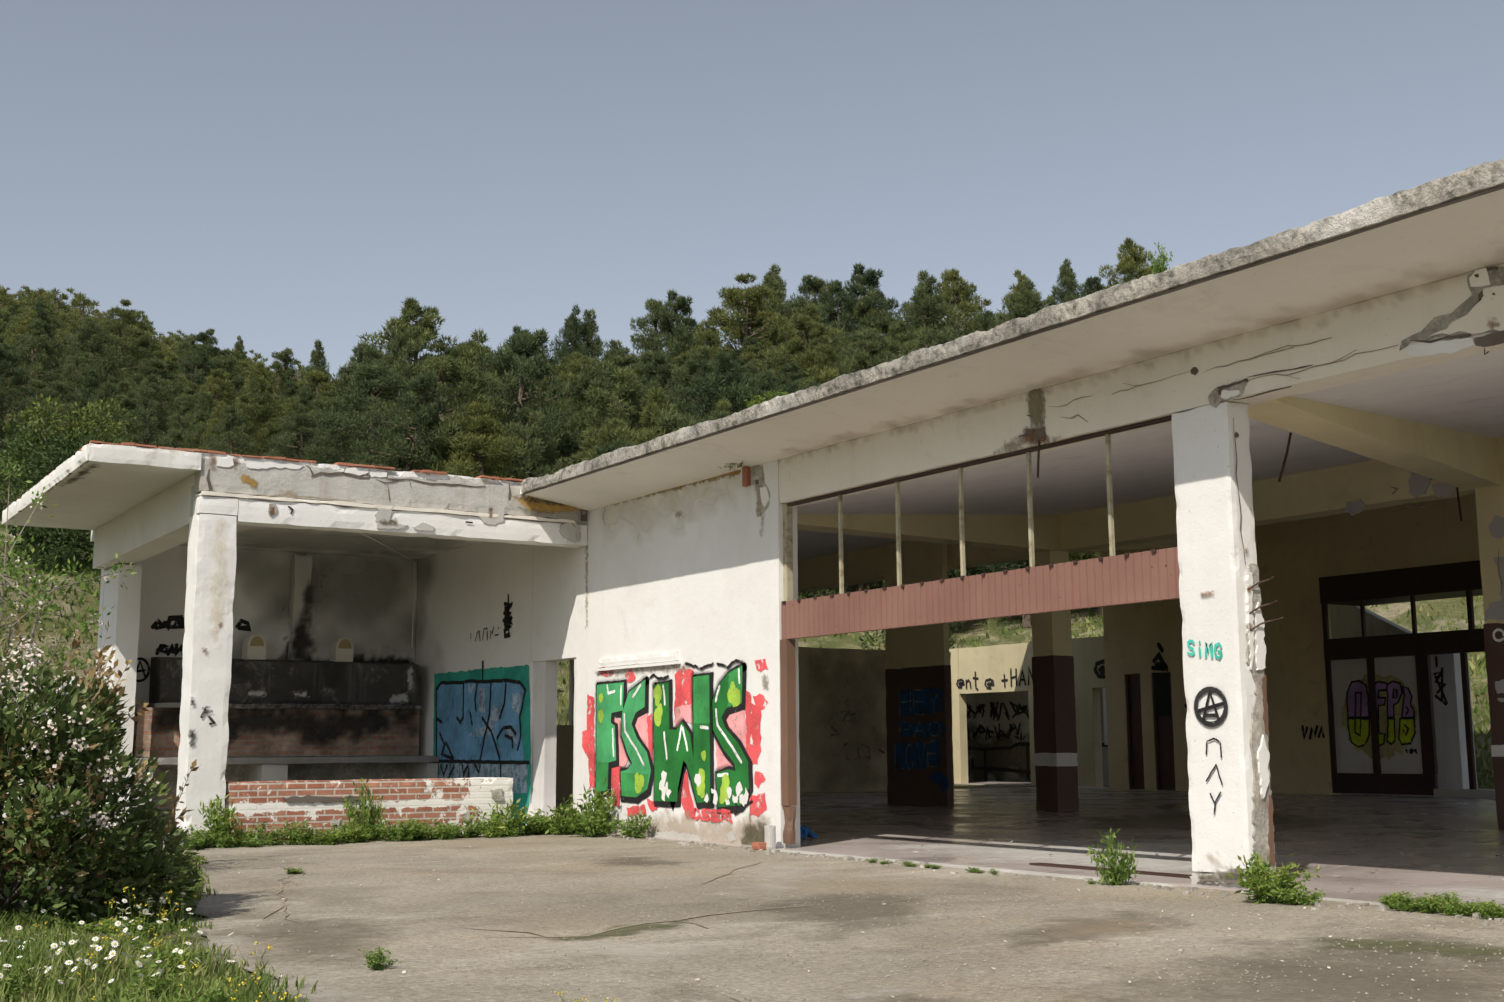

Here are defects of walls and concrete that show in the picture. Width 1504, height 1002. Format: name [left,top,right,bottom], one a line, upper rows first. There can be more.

spalling [1399,266,1504,358]
crack [205,469,213,497]
crack [262,465,511,501]
spalling [1018,388,1047,478]
spalling [1208,378,1249,408]
crack [1048,334,1471,565]
spalling [1196,563,1283,884]